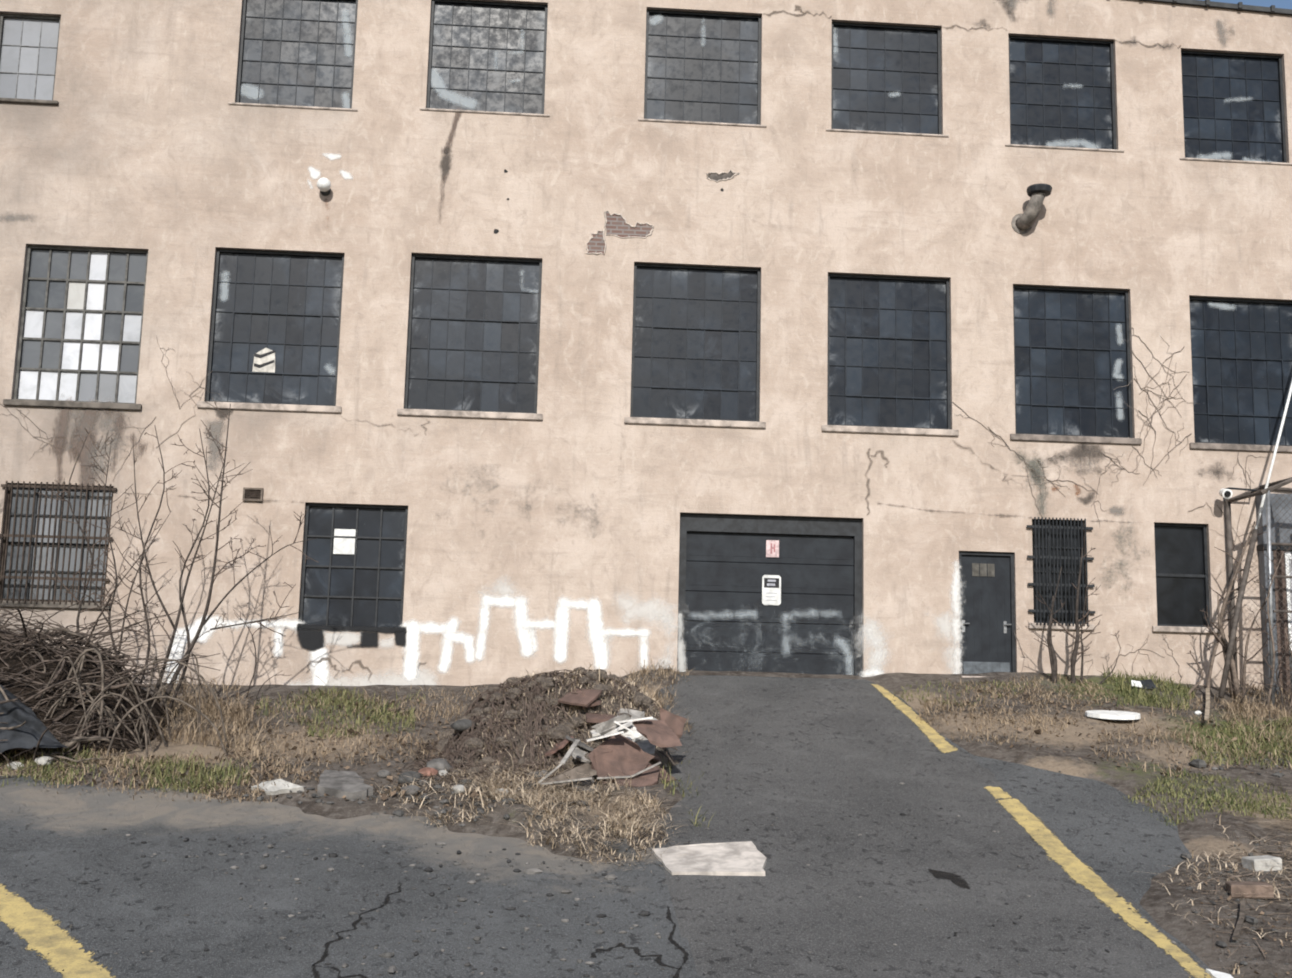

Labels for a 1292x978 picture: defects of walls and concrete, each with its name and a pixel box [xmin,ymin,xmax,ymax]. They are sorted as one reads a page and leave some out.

crack [766,5,831,18]
flaking render [706,169,740,191]
flaking render [585,210,654,255]
damp [51,399,144,492]
crack [866,449,933,512]
damp [1031,443,1103,514]